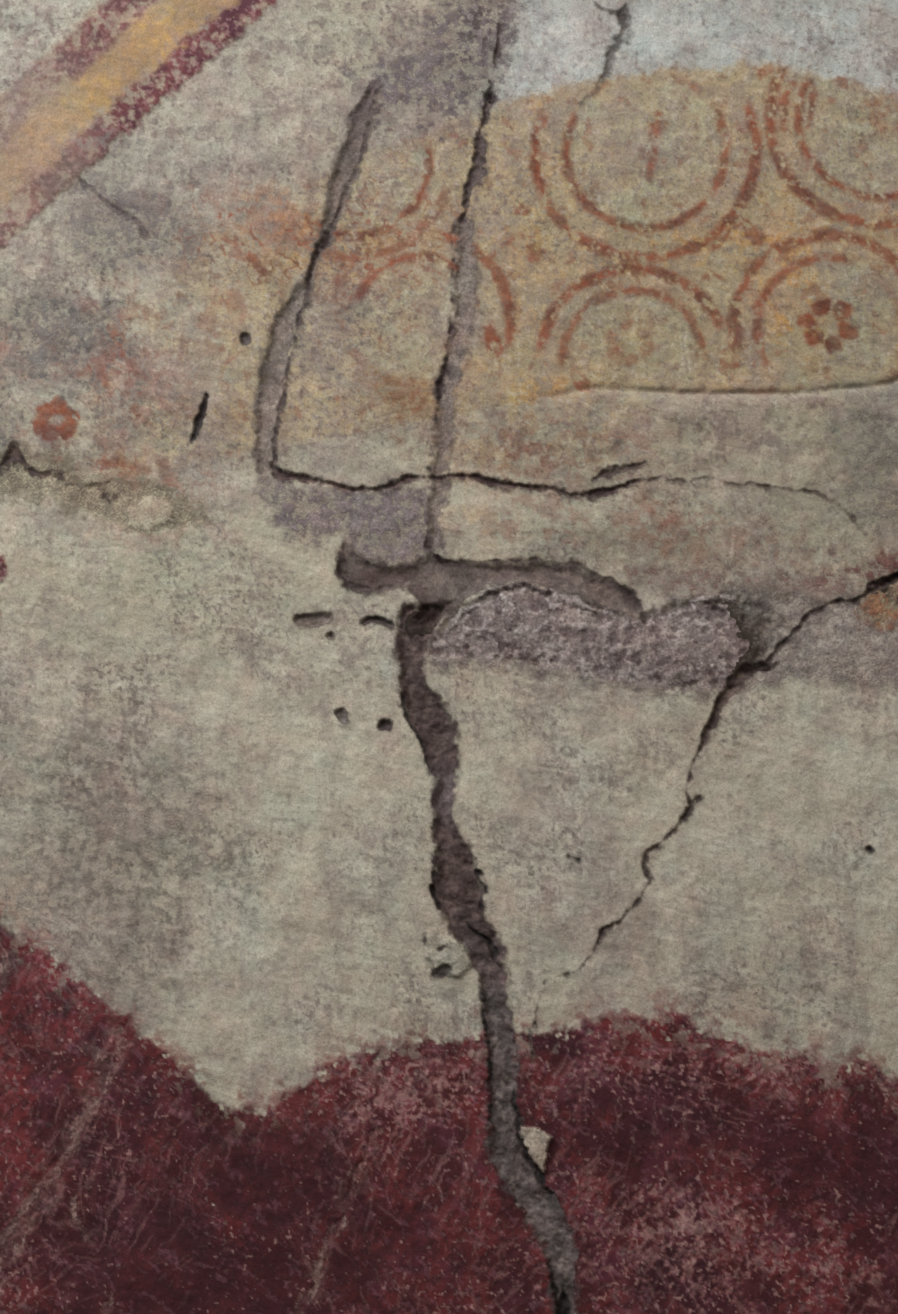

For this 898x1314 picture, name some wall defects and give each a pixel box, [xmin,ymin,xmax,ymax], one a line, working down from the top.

crack [251,18,898,1314]
crack [580,2,631,103]